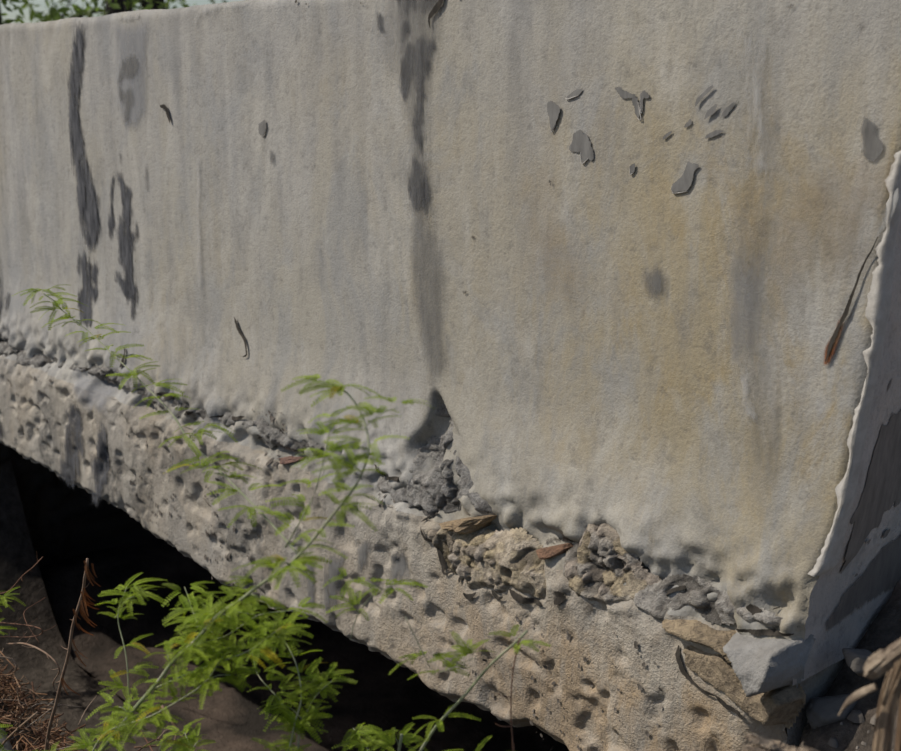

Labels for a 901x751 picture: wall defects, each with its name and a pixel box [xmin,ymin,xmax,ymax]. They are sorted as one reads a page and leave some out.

damp [67,25,138,327]
damp [119,30,143,122]
damp [398,0,443,368]
peeling [569,130,594,164]
peeling [614,87,649,121]
spalling [0,341,206,419]
corrosion [824,320,844,365]
spalling [808,151,901,577]
damp [60,407,110,504]
spalling [218,412,323,464]
spalling [377,403,816,729]
crack [675,645,743,720]